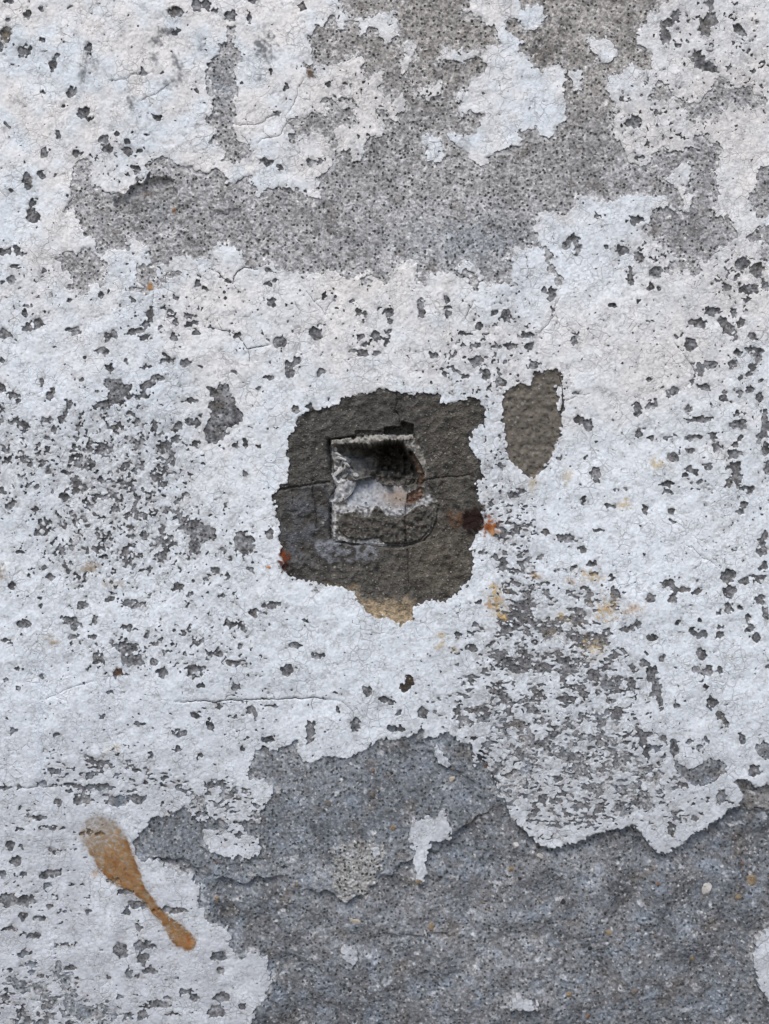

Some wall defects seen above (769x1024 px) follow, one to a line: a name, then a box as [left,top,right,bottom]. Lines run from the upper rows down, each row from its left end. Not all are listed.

peeling [0,0,769,694]
rust [267,549,290,571]
rust [454,507,501,537]
spalling [0,488,769,1024]
rust [81,821,196,951]